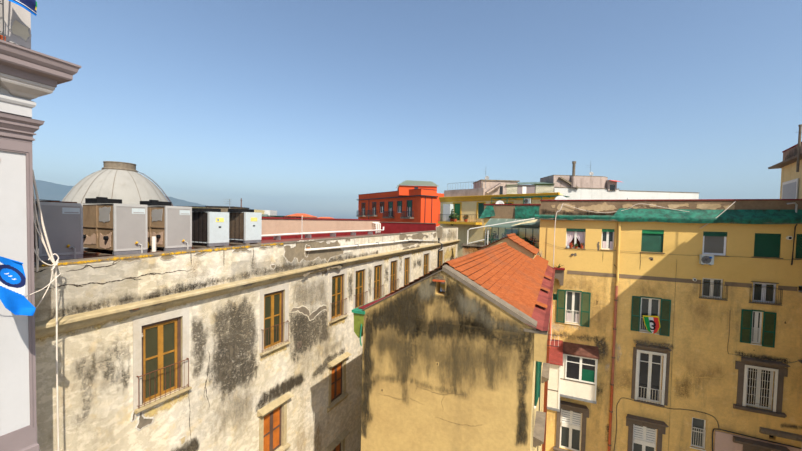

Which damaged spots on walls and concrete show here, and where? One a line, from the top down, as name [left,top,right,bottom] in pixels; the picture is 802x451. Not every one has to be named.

peeling [551,202,657,212]
crack [34,255,195,289]
peeling [289,304,327,321]
water stain [77,347,120,380]
mould [192,320,206,374]
mould [212,300,257,396]
water stain [290,311,328,360]
water stain [313,349,344,376]
water stain [360,273,534,444]
water stain [552,326,608,360]
water stain [256,374,303,411]
water stain [176,439,199,451]